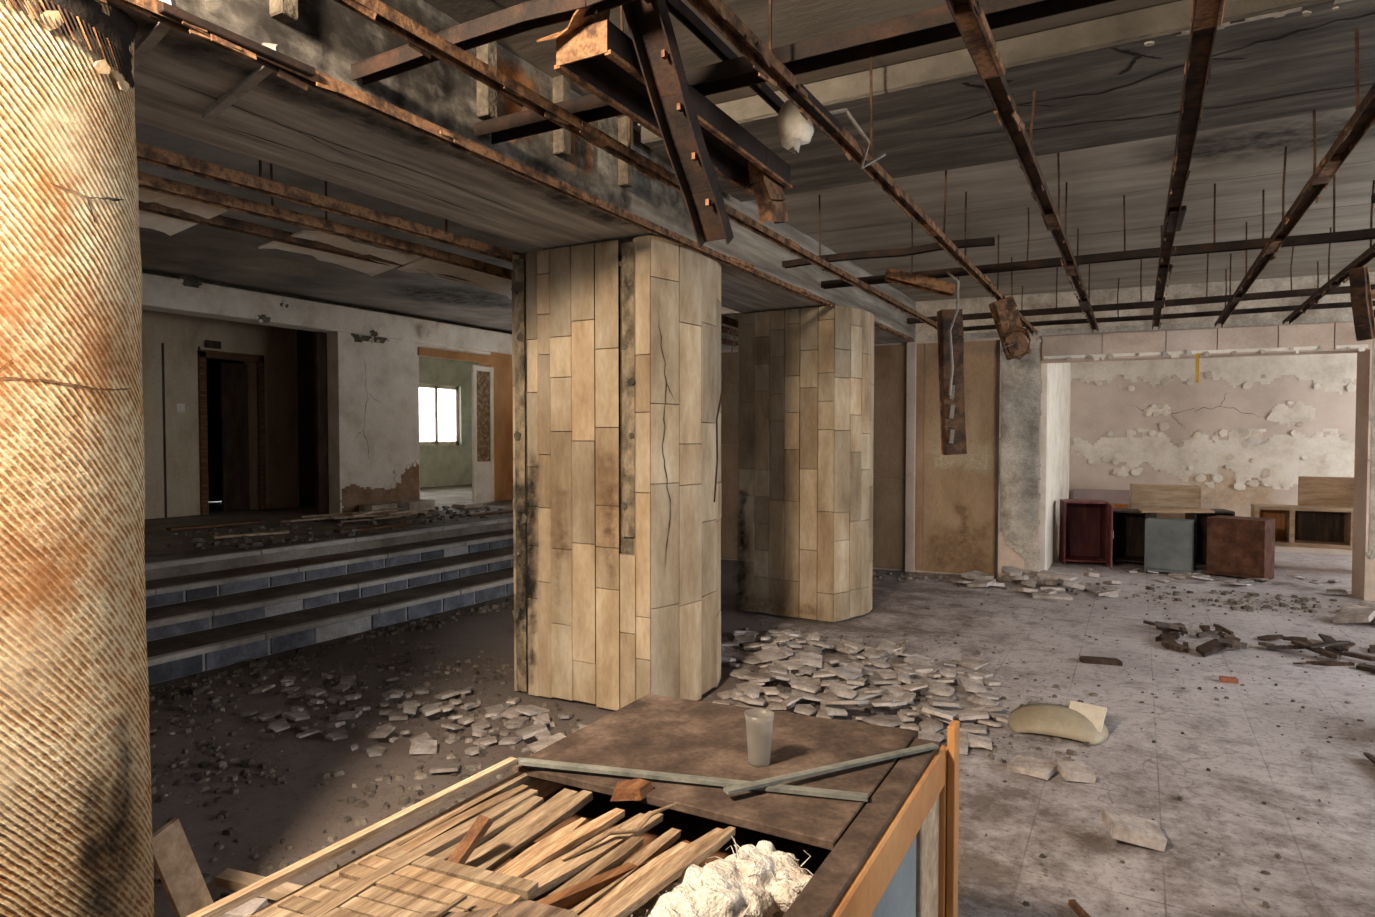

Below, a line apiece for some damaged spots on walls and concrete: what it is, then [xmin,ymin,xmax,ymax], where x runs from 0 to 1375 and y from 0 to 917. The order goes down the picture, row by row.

spalling [1,0,137,92]
leakage [299,0,408,60]
leakage [379,0,448,33]
leakage [396,60,452,108]
peeling [340,459,420,513]